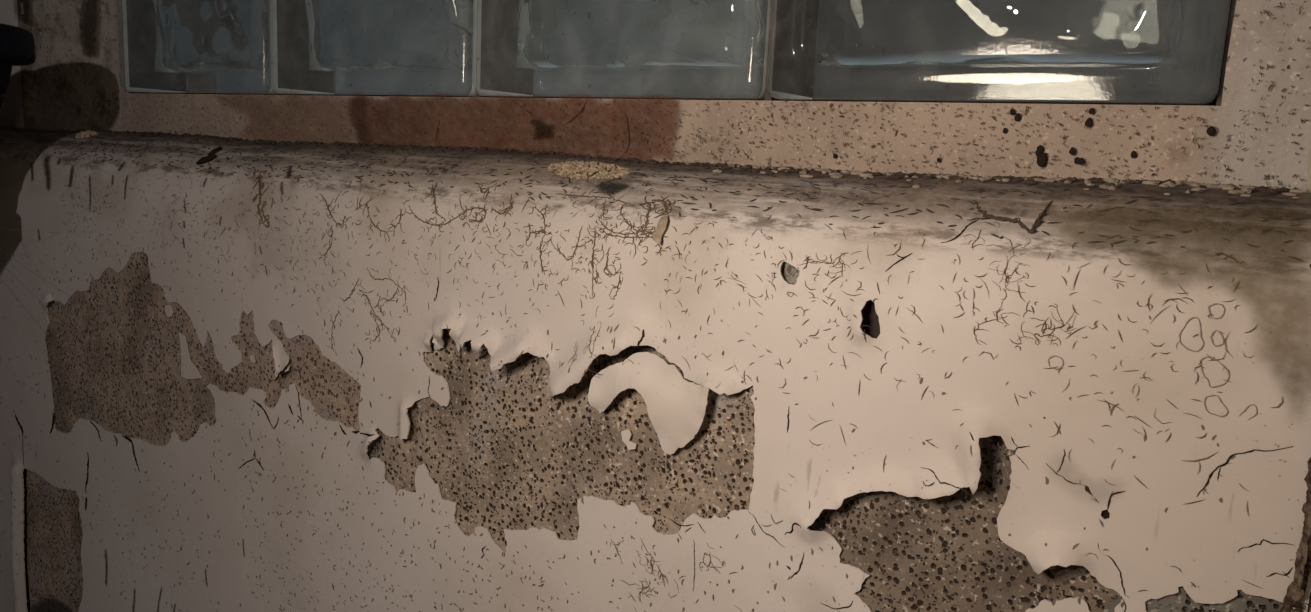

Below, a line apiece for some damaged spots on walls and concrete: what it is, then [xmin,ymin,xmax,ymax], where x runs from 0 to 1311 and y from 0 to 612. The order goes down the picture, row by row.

peeling [45,252,362,446]
peeling [25,469,83,612]
peeling [367,329,755,551]
peeling [808,435,1122,612]
peeling [1145,586,1283,612]
crack [1197,446,1311,612]